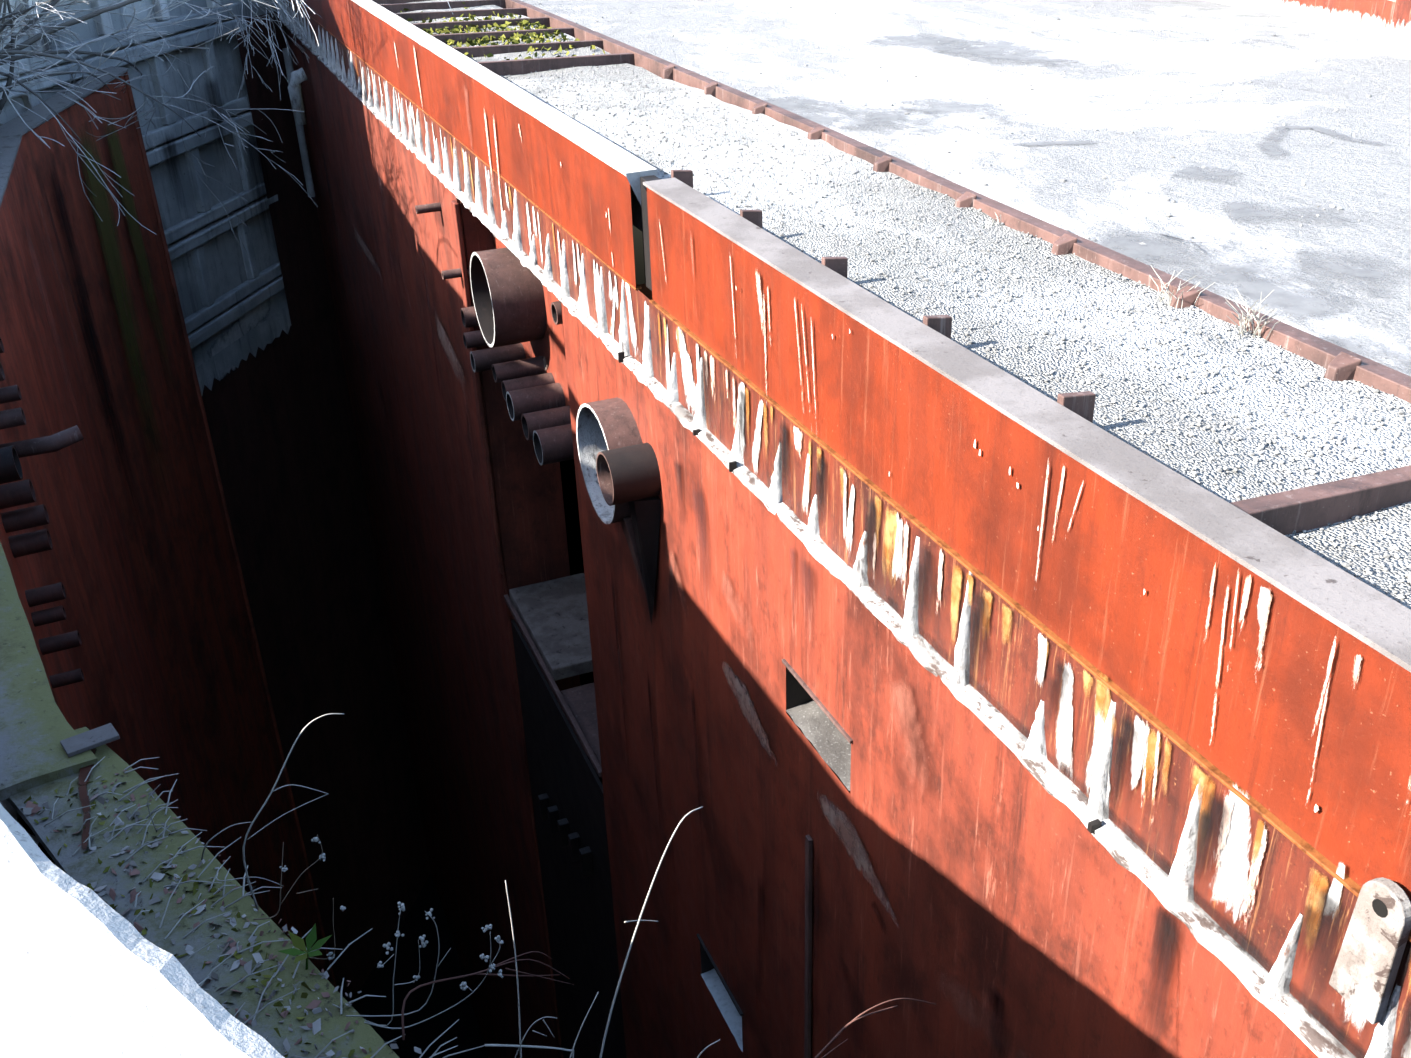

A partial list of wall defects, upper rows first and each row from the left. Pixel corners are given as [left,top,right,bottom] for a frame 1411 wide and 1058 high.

corrosion [658,314,773,447]
corrosion [794,426,821,477]
damp [1036,465,1083,579]
corrosion [936,551,1011,641]
corrosion [1037,634,1048,683]
damp [1206,563,1272,741]
damp [1056,664,1171,806]
corrosion [1131,717,1160,787]
damp [1307,639,1336,801]
damp [1197,779,1271,971]
corrosion [1243,820,1267,925]
damp [1308,1005,1364,1058]